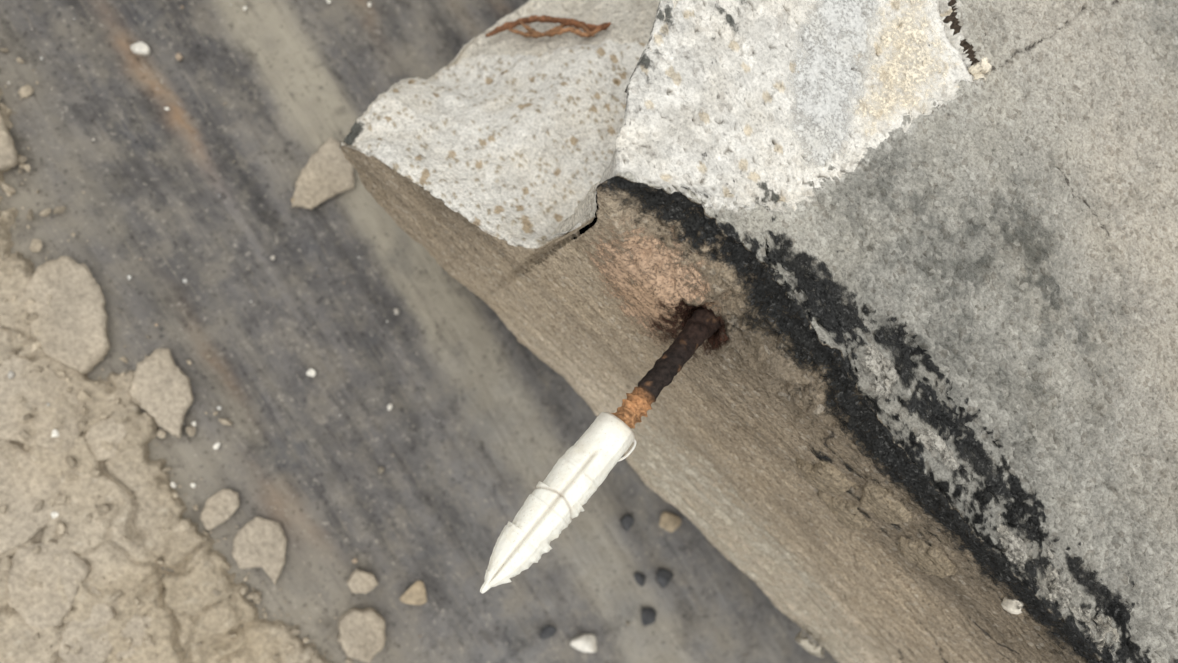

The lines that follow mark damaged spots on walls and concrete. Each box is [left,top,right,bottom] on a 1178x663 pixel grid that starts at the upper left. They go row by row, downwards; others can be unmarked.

spalling [341,0,980,249]
crack [943,0,1119,80]
corrosion [649,300,729,359]
leakage [597,176,1152,663]